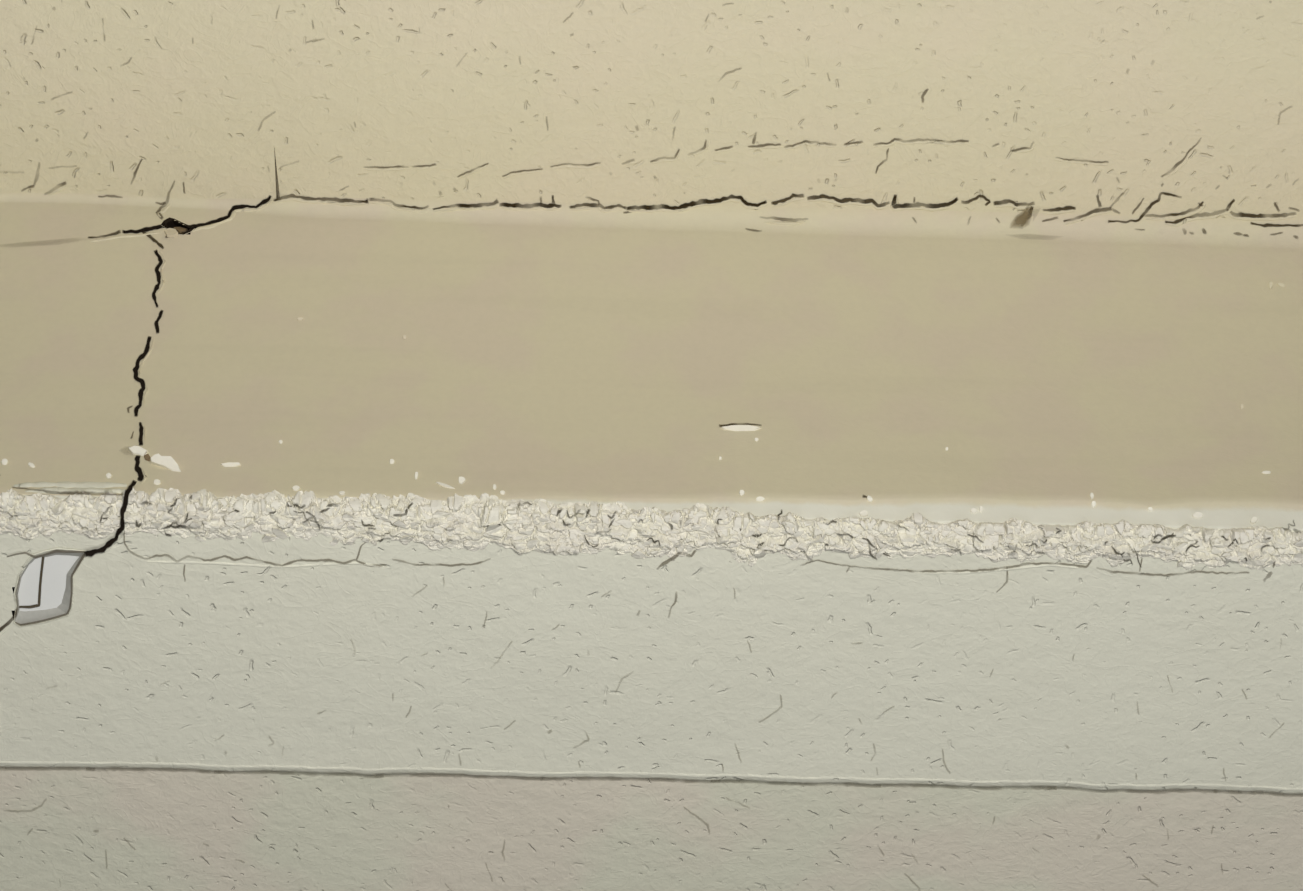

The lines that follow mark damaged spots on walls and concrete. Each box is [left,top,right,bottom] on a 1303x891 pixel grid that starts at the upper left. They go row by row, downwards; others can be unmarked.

crack [84,138,1302,578]
crack [0,613,17,637]
spalling [0,488,1303,628]
crack [0,719,1303,791]